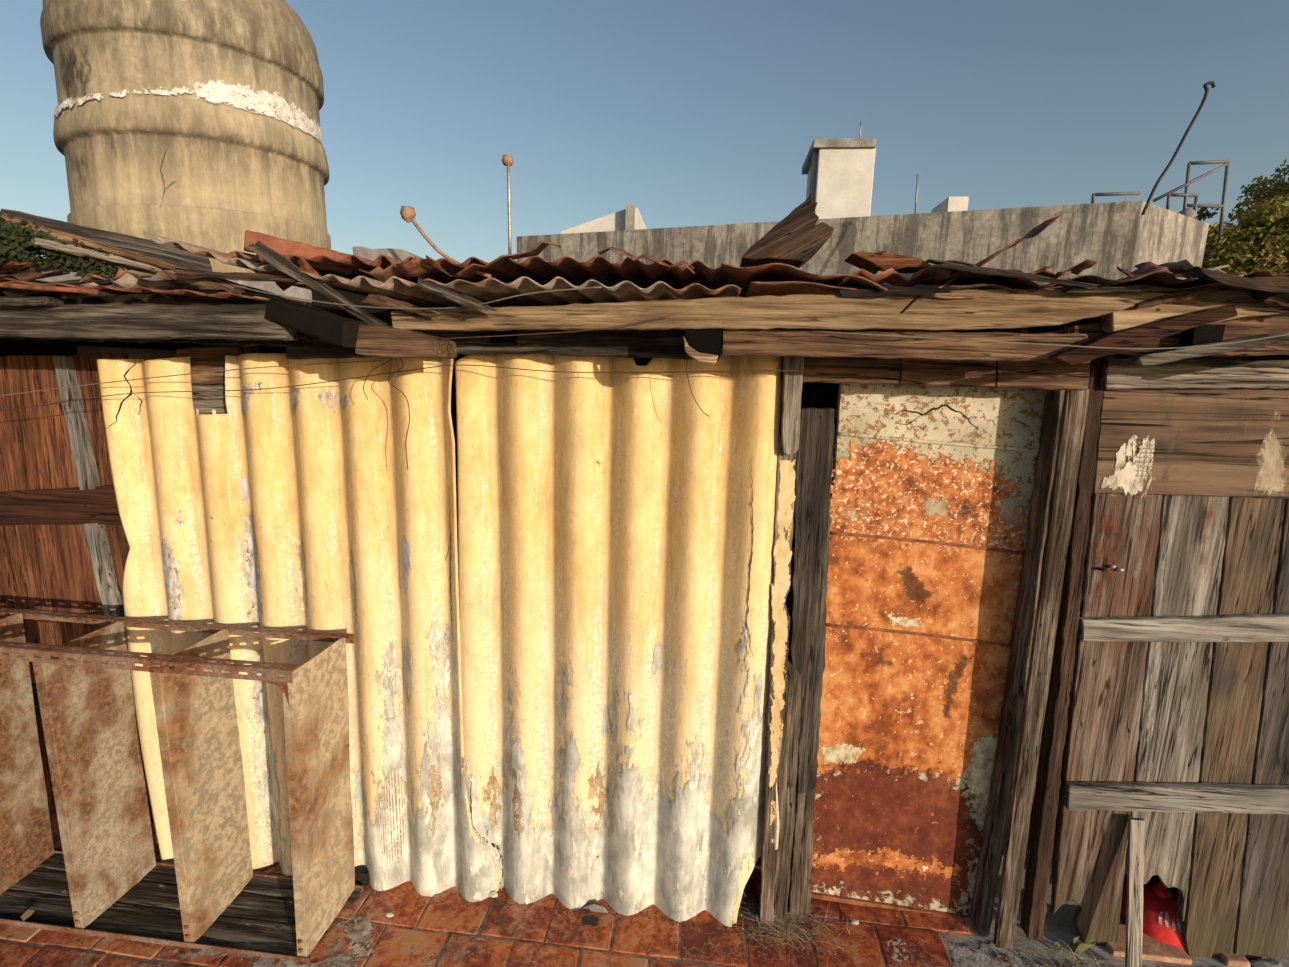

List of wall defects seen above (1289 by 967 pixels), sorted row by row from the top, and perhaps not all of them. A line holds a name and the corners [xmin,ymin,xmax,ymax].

spalling [54,78,323,144]
peeling [1101,435,1155,498]
peeling [1255,436,1283,494]
peeling [350,460,796,927]
corrosion [810,433,1029,915]